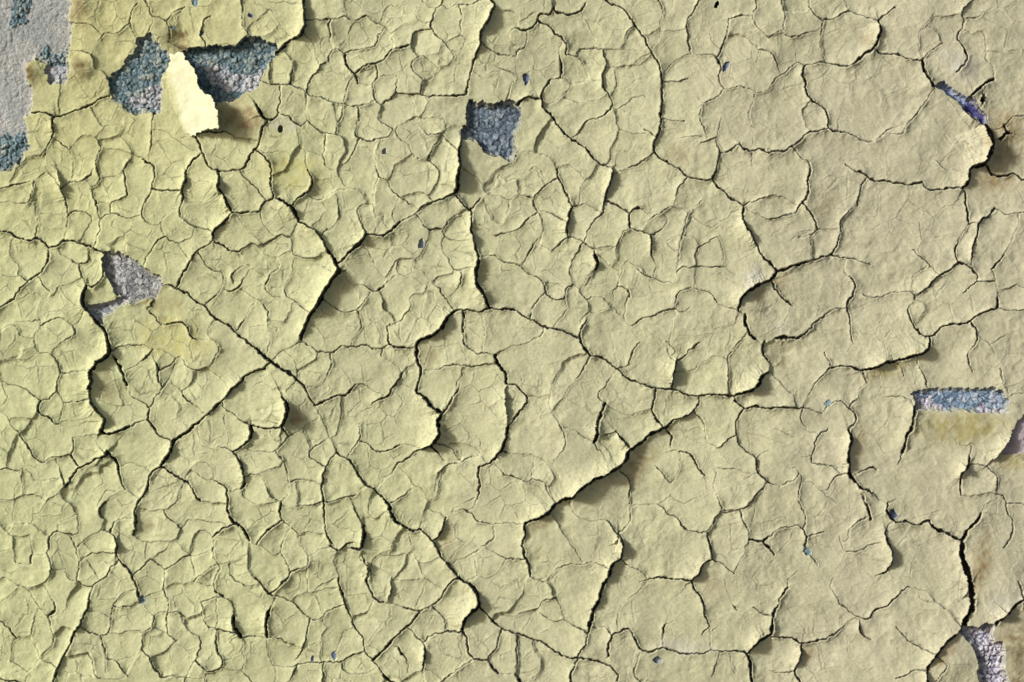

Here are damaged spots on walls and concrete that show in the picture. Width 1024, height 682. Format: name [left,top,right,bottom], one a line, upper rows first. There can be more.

flaking render [0,0,73,173]
peeling [107,30,278,137]
crack [194,0,519,202]
peeling [461,99,522,162]
crack [500,0,1024,311]
peeling [933,81,992,174]
crack [0,117,143,553]
peeling [86,250,164,325]
peeling [910,387,1009,414]
crack [106,502,377,682]
crack [712,436,825,556]
crack [838,492,998,628]